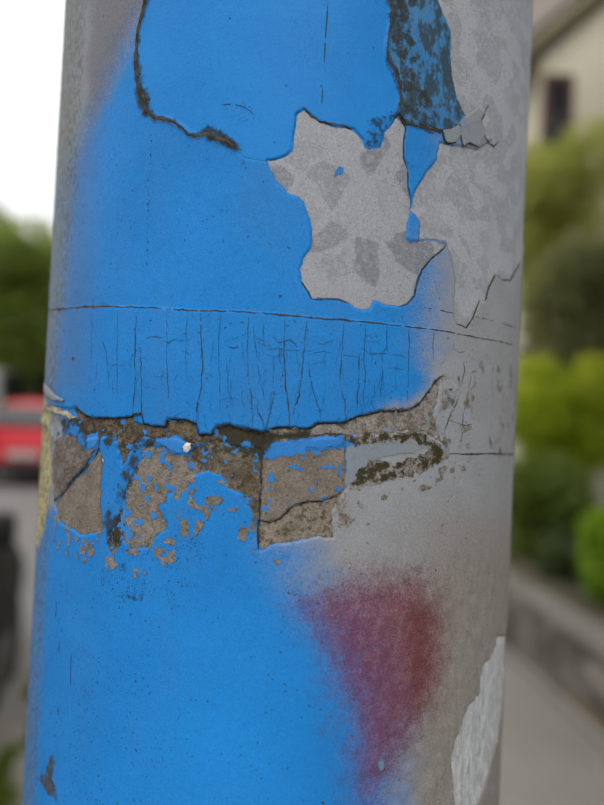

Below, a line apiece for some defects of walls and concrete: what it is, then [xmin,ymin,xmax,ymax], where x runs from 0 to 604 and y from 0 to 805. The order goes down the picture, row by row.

peeling [134,0,533,329]
spalling [42,374,466,572]
crack [49,305,515,470]
peeling [451,636,505,805]